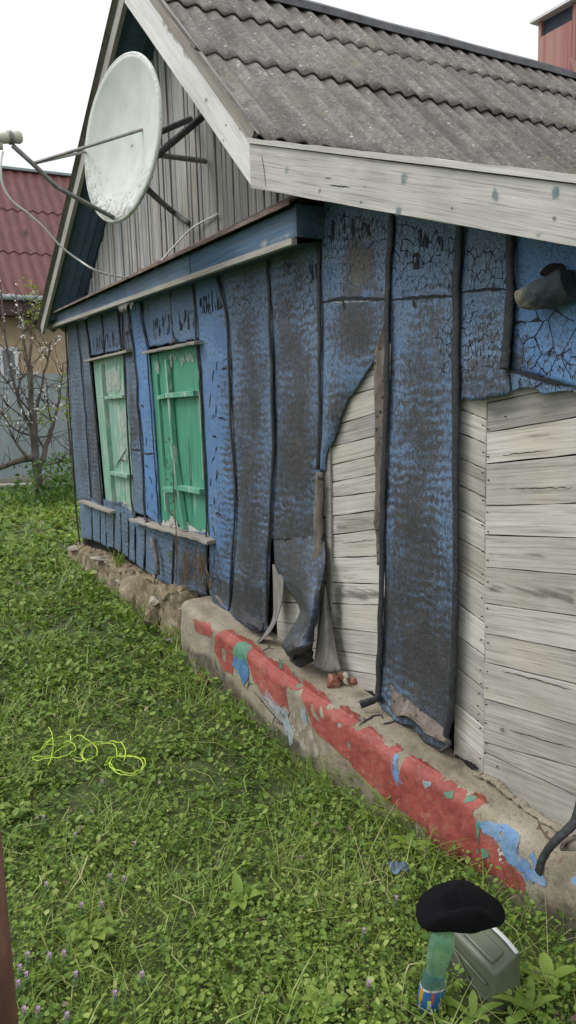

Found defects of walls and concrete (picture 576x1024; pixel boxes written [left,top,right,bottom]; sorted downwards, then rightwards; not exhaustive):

crack [229,241,576,390]
peeling [193,619,546,892]